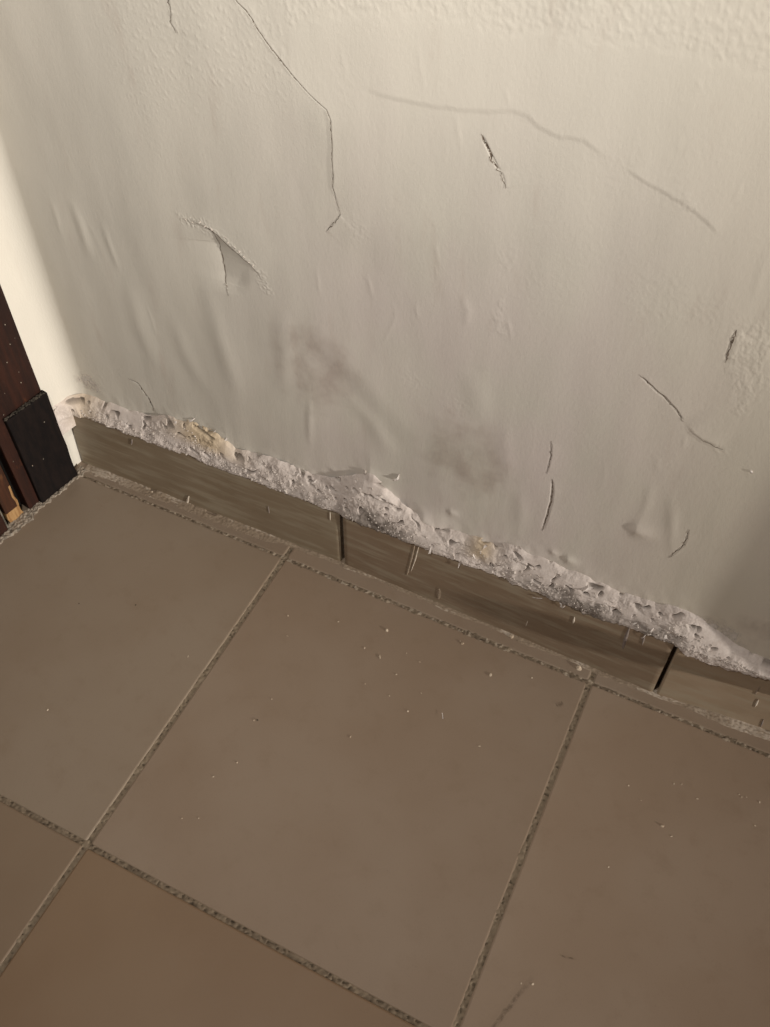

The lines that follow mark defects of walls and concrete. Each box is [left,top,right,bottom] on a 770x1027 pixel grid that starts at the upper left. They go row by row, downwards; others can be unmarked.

crack [165,0,180,39]
crack [230,0,345,236]
crack [476,128,510,194]
flaking render [175,210,275,310]
crack [632,369,730,454]
crack [538,438,557,534]
flaking render [52,393,770,680]